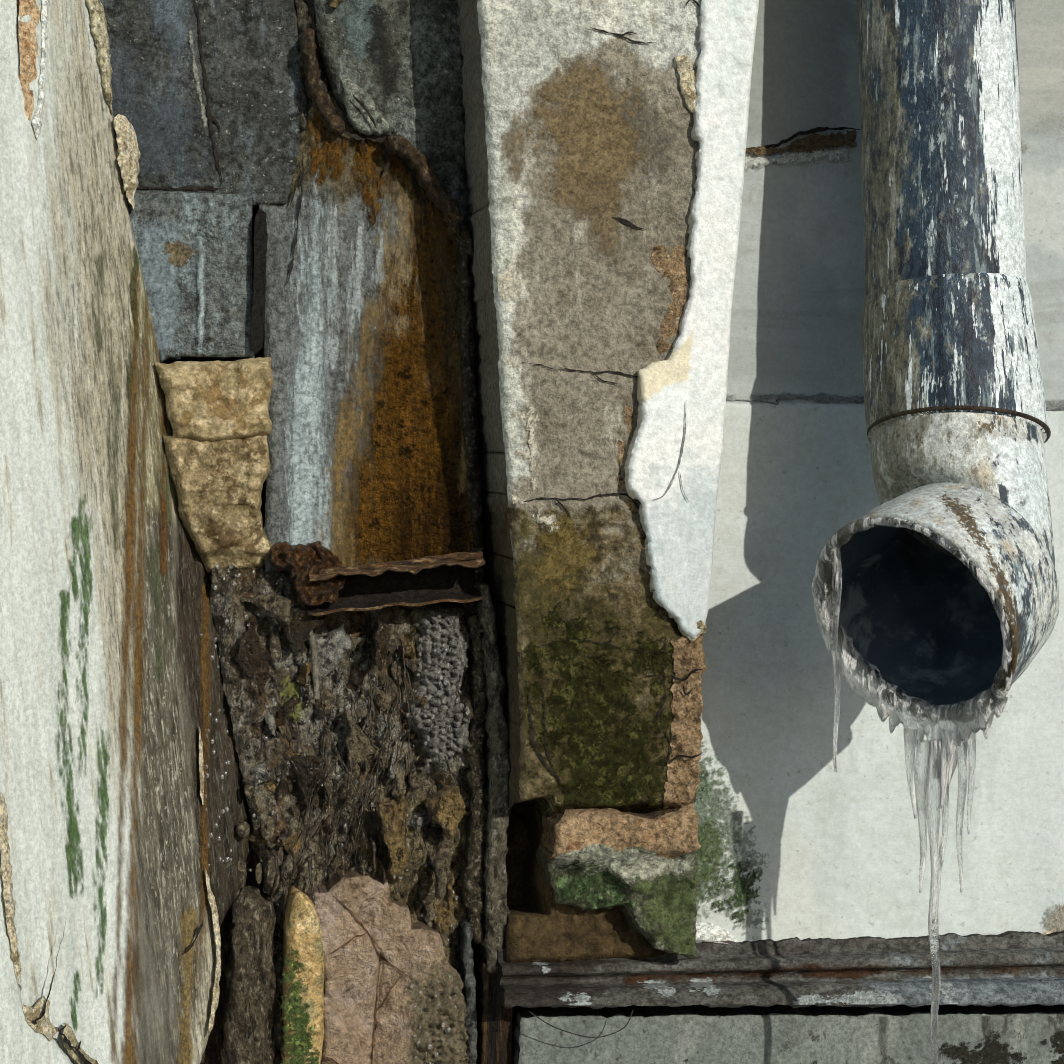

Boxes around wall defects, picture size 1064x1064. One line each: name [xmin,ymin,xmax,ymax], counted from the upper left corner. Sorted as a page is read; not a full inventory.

spalling [16,0,50,139]
damp [502,56,676,256]
crack [744,127,861,171]
rust [303,108,475,567]
damp [497,261,523,300]
damp [532,510,558,531]
crack [516,493,641,519]
peeling [536,0,759,958]
rust [114,273,168,1064]
rust [178,585,210,1064]
crack [33,918,99,1064]
peeling [940,1031,1027,1064]